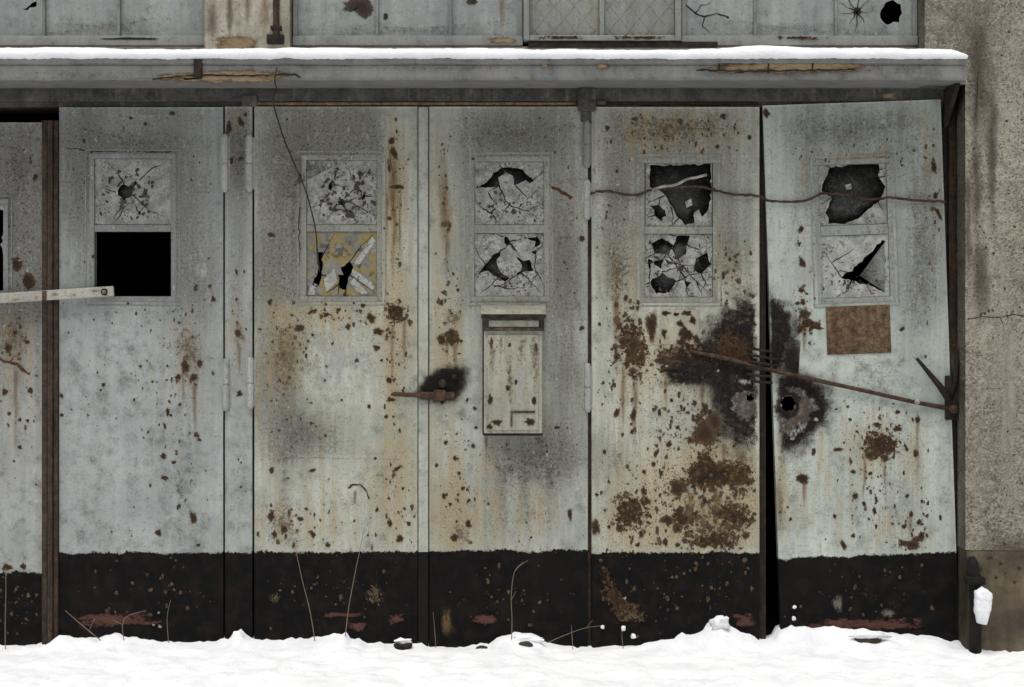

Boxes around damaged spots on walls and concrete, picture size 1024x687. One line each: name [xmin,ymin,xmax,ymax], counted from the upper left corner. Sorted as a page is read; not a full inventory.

crack [686,2,729,31]
crack [841,0,870,29]
peeling [153,69,301,83]
peeling [696,63,878,75]